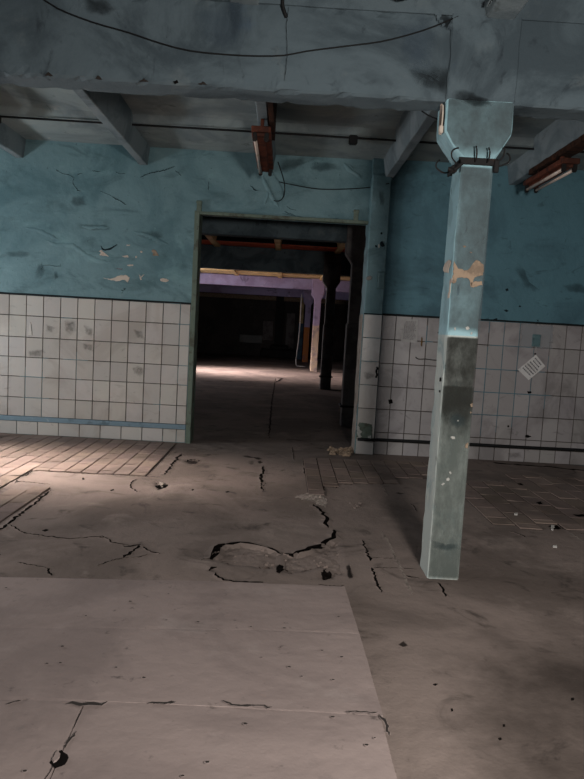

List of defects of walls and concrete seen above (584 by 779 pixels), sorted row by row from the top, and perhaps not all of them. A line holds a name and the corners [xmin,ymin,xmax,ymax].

crack [56,163,181,205]
peeling [105,251,143,282]
peeling [443,246,484,298]
crack [256,465,269,493]
crack [7,524,160,566]
spalling [200,504,353,586]